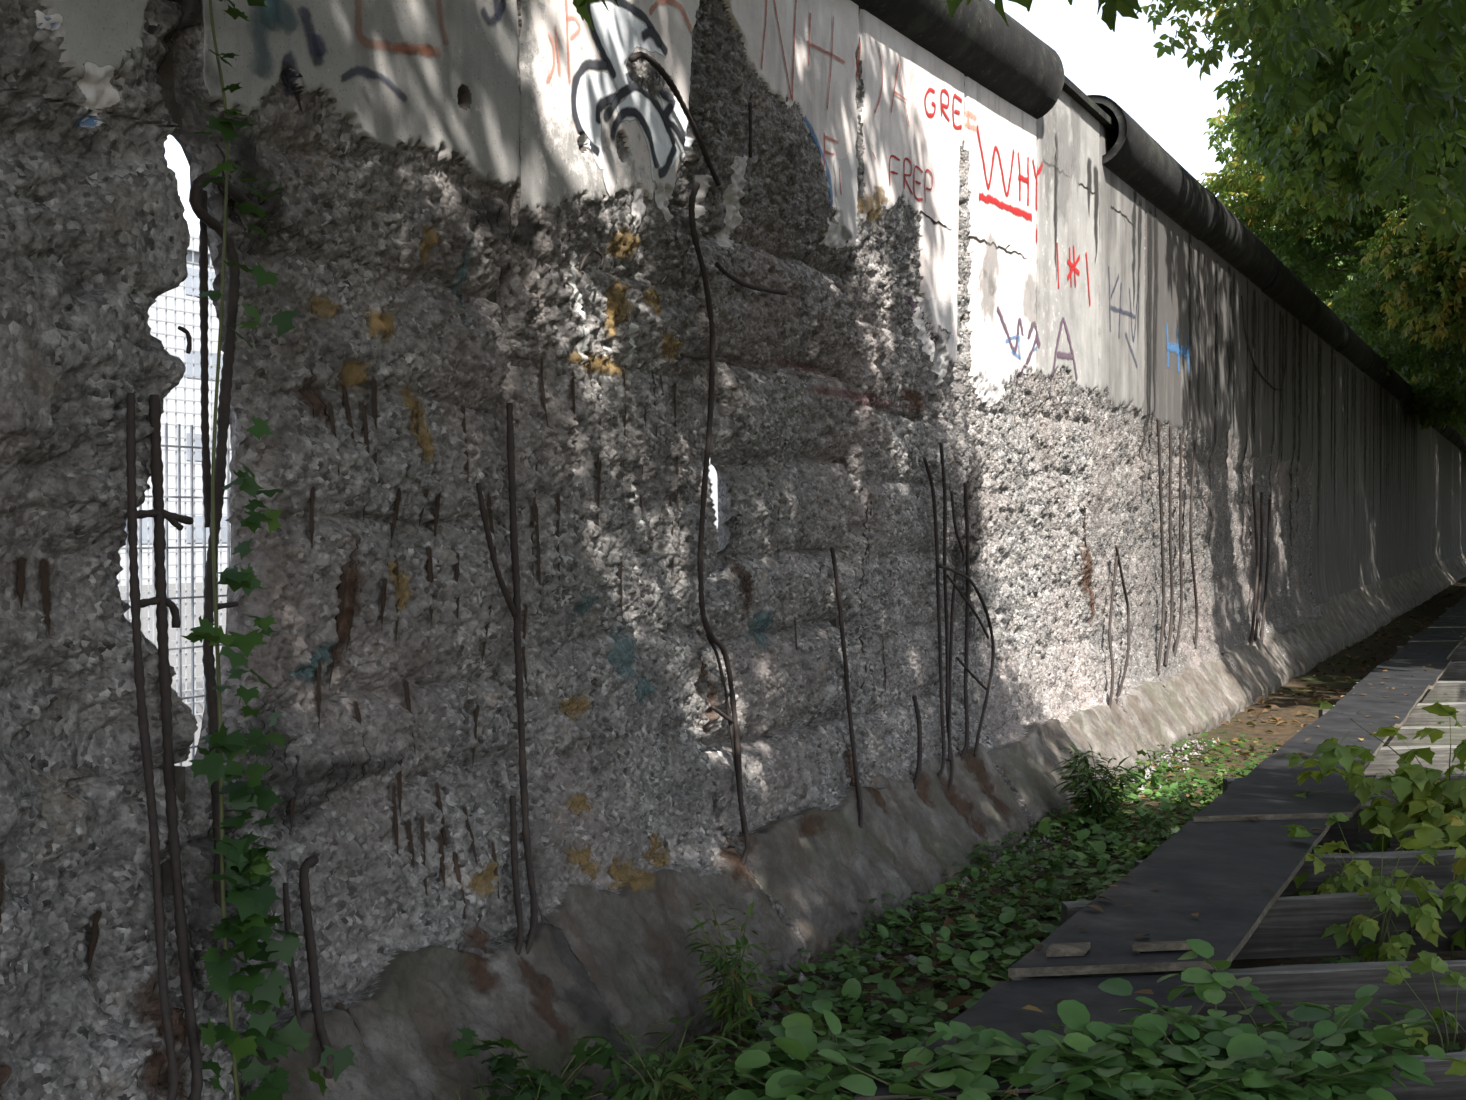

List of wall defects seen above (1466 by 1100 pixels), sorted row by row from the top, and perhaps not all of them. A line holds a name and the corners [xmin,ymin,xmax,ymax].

crack [919,210,1032,262]
spalling [500,0,1306,925]
rust [16,557,51,636]
spalling [0,0,538,1100]
rust [316,506,365,731]
rust [911,749,1009,836]
rust [140,983,188,1100]
rust [521,960,572,1051]